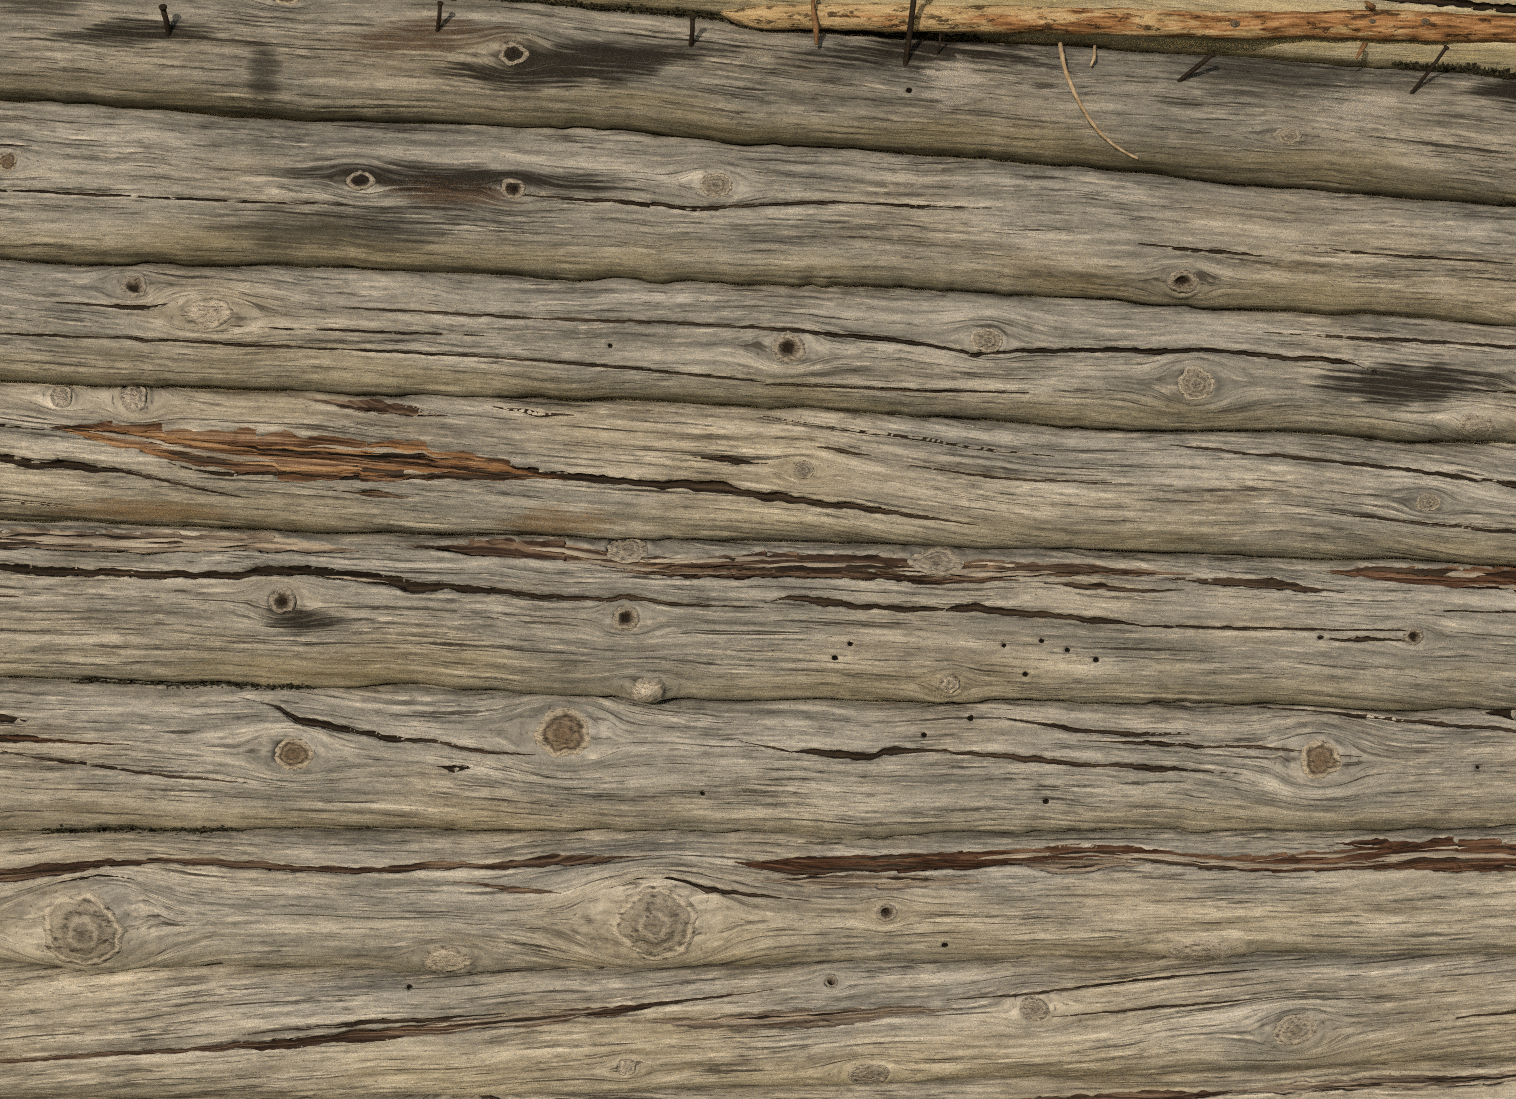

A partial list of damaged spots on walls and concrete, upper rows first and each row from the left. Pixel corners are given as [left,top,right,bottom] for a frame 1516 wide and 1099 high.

leakage [360,19,738,91]
crack [0,302,1516,488]
crack [0,424,977,525]
crack [1330,512,1516,534]
crack [0,563,1516,642]